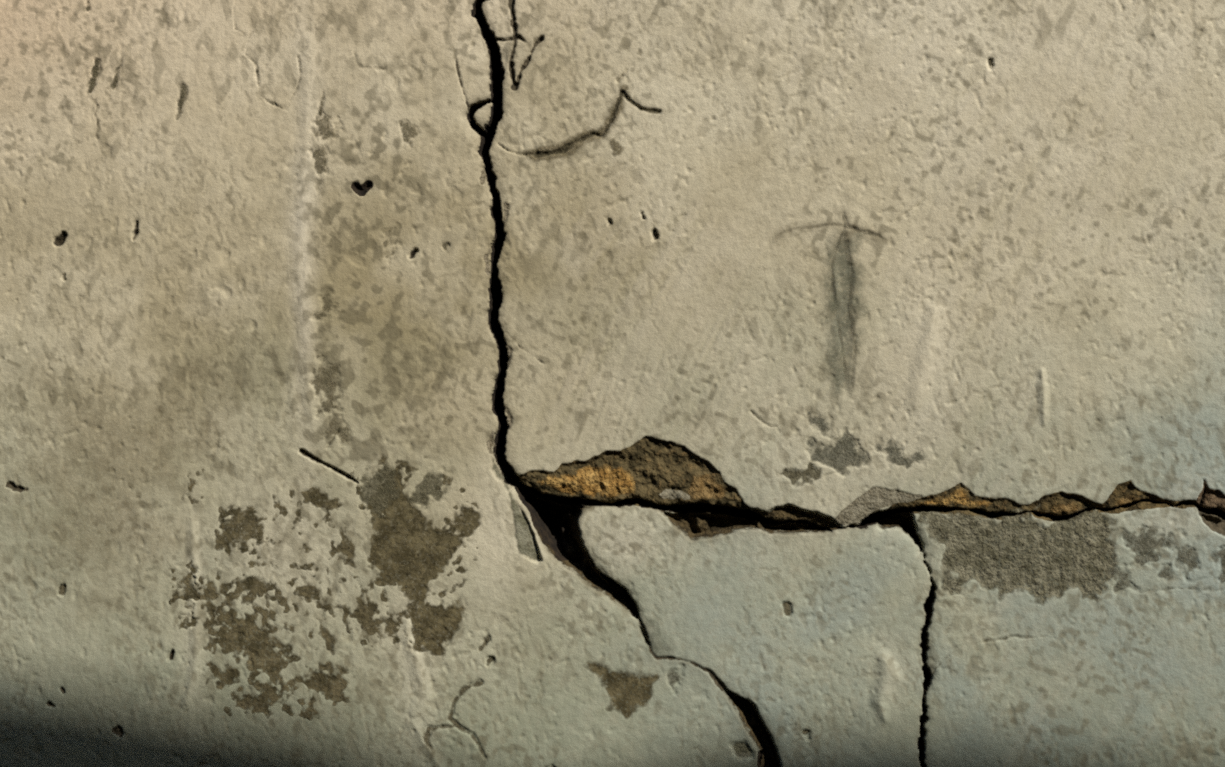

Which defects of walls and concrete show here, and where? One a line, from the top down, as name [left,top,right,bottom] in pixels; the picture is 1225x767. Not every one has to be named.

crack [456,0,1225,767]
peeling [781,412,924,484]
peeling [493,436,1225,603]
crack [424,681,483,754]